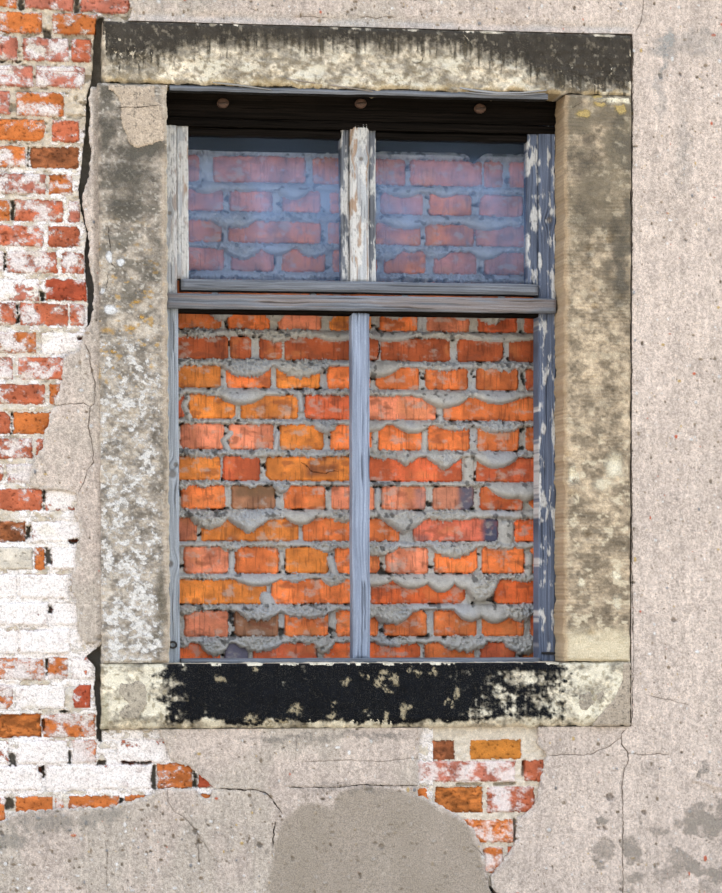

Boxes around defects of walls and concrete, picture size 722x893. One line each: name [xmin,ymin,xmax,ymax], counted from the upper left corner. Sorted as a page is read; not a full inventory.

crack [62,345,96,491]
flaking render [0,0,225,824]
leakage [100,339,167,663]
crack [550,0,686,893]
leakage [152,662,572,726]
crack [167,791,218,862]
crack [220,788,283,845]
crack [290,782,418,790]
flaking render [408,725,557,893]